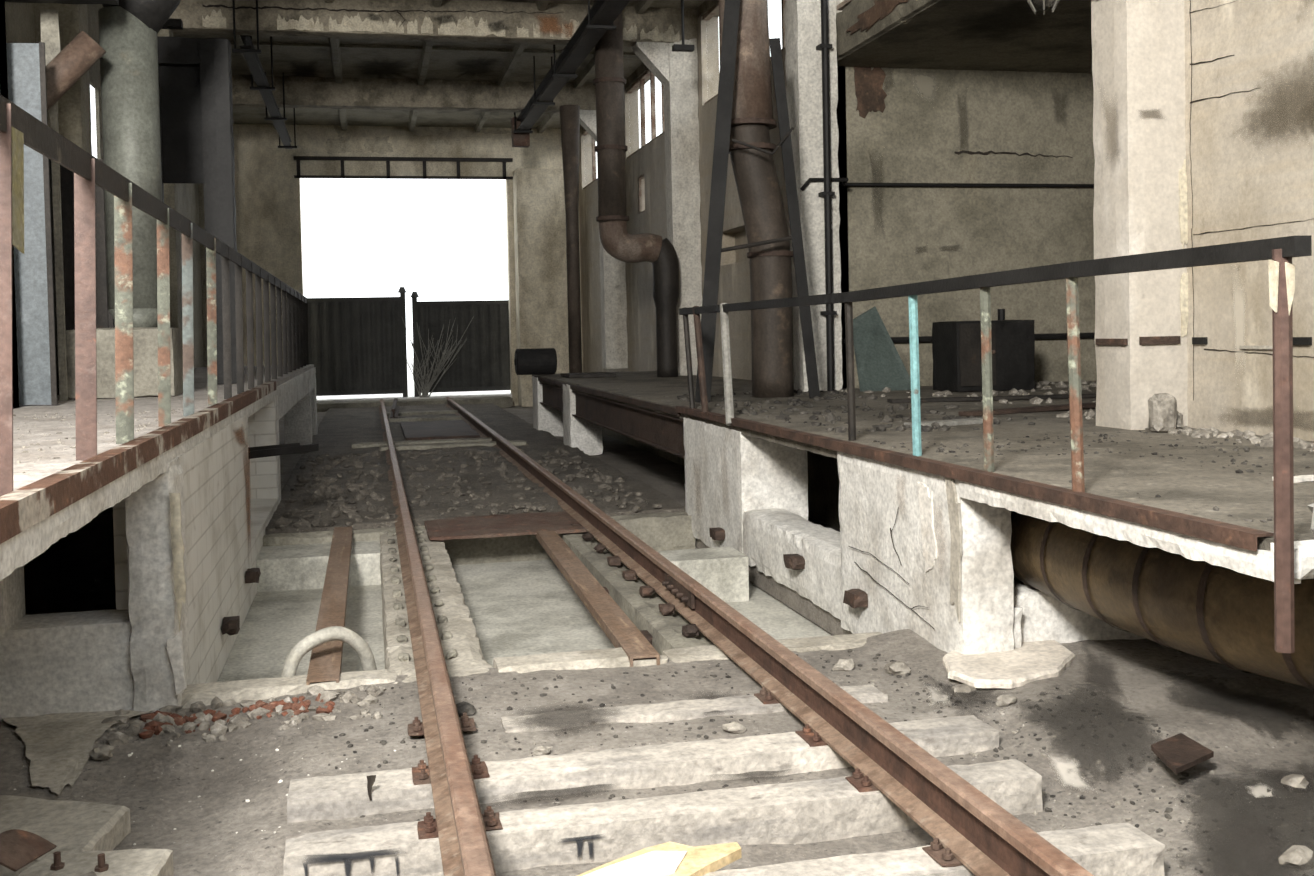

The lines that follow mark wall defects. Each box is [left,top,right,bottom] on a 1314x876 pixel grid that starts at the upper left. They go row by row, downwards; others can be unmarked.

peeling [202,9,226,28]
peeling [277,13,580,39]
peeling [623,24,680,42]